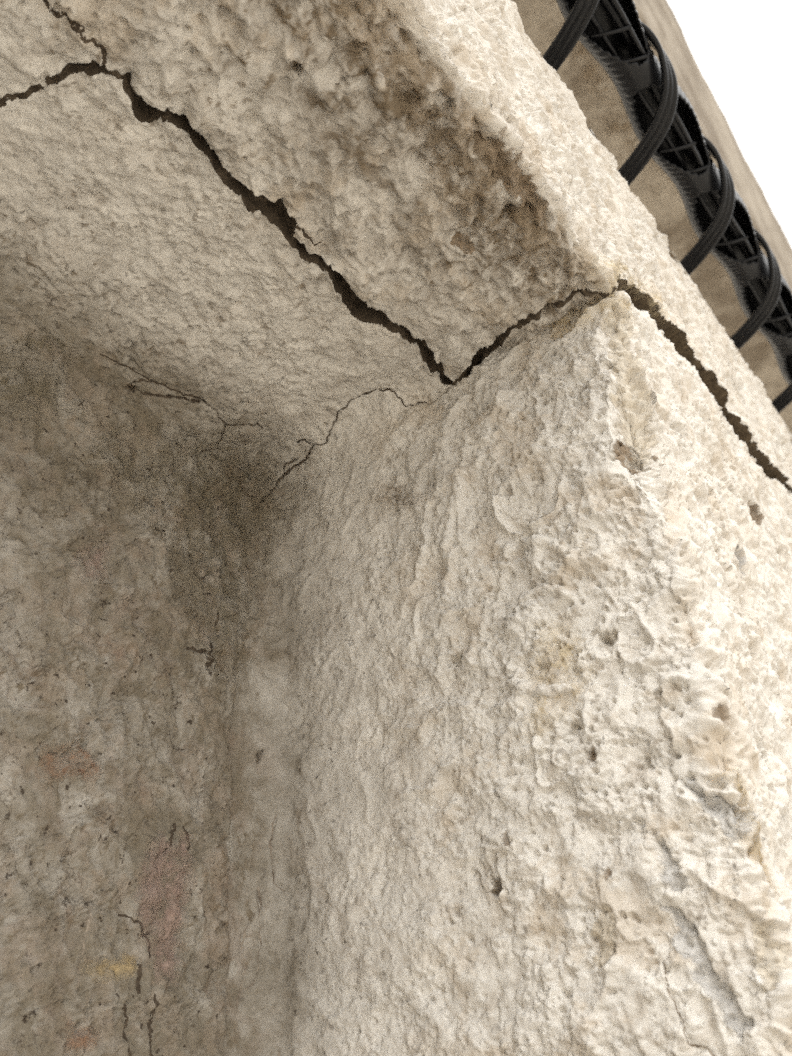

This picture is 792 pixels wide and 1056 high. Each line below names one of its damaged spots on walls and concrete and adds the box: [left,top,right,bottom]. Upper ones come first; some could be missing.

crack [0,0,792,511]